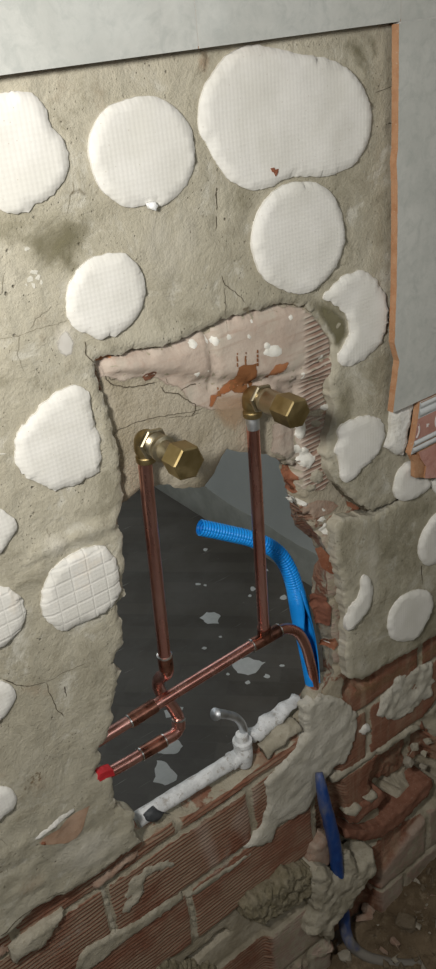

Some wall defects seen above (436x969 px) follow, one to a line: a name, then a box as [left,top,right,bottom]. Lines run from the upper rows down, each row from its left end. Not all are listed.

crack [0,307,68,369]
rust [209,350,289,407]
spalling [94,305,361,535]
spalling [315,547,334,574]
spalling [309,593,332,626]
crack [3,666,78,715]
spalling [35,806,90,845]
spalling [304,828,330,866]
spalling [335,765,433,841]